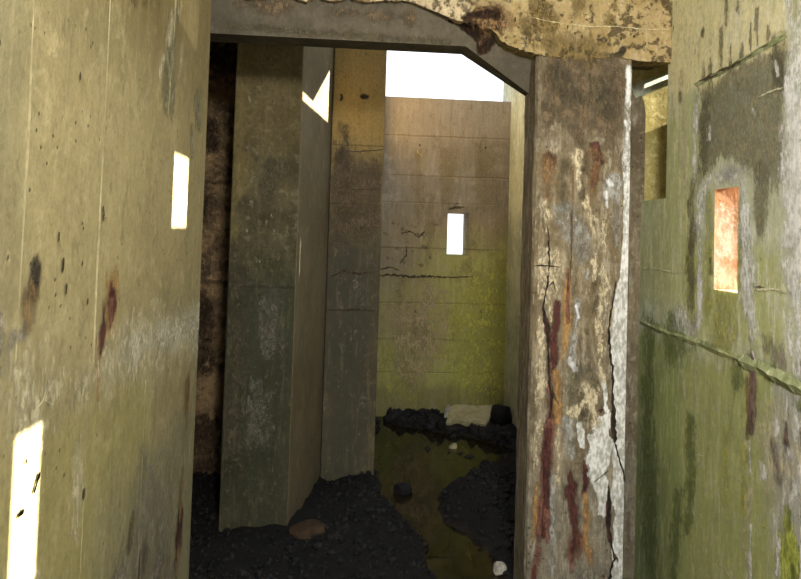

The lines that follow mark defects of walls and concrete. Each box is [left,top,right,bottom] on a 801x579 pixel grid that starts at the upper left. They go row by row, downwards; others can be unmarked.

leakage [0,255,42,362]
corrosion [97,269,118,401]
crack [331,231,473,278]
peeling [535,247,565,410]
corrosion [531,269,572,579]
crack [535,211,573,417]
peeling [542,120,630,579]
crack [595,282,625,579]
leakage [671,0,801,377]
corrosion [746,370,757,439]
corrosion [564,459,593,574]